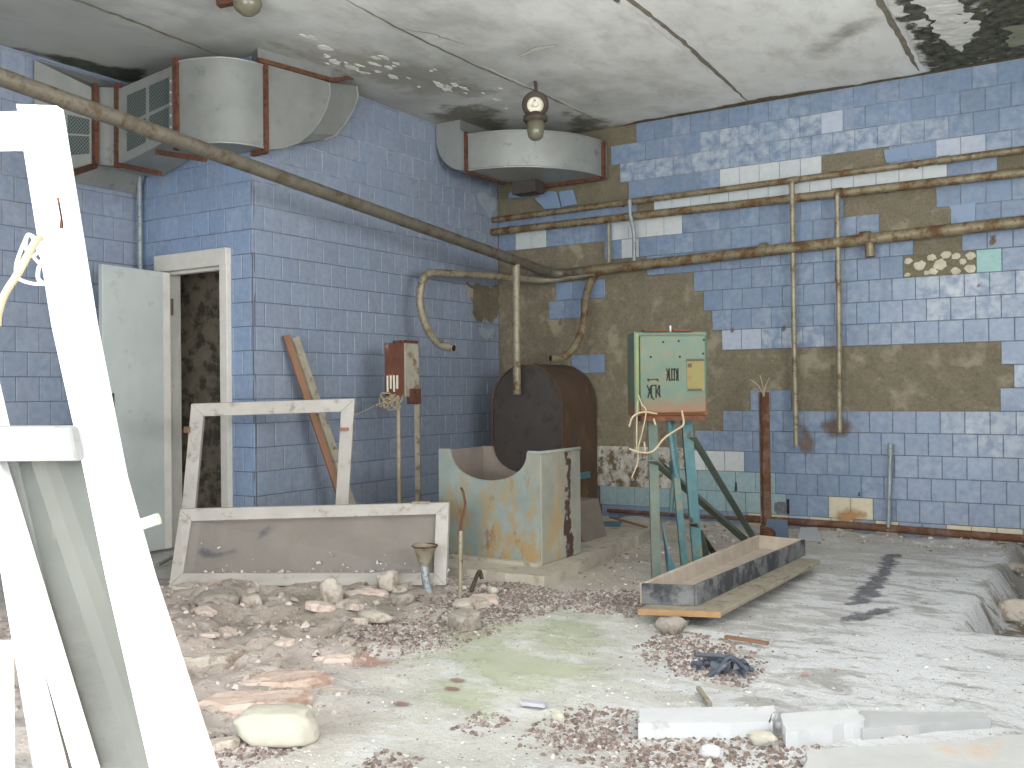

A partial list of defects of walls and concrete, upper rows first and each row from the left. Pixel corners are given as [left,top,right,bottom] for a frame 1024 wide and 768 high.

peeling [300,34,420,88]
peeling [429,69,469,94]
leakage [435,105,503,130]
leakage [571,116,605,134]
peeling [497,124,654,217]
peeling [822,147,889,173]
peeling [997,153,1024,171]
peeling [843,187,975,256]
peeling [466,242,1014,450]